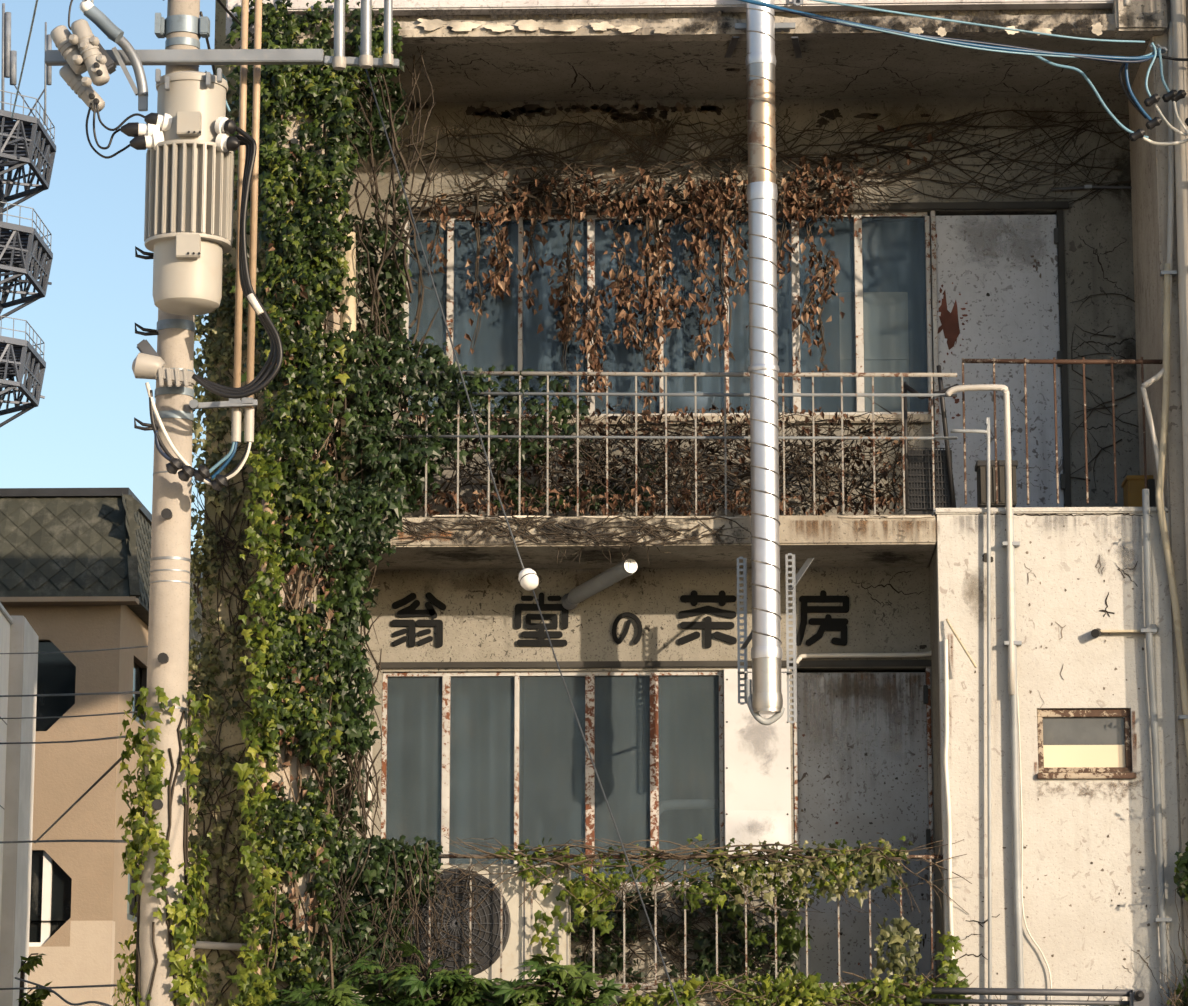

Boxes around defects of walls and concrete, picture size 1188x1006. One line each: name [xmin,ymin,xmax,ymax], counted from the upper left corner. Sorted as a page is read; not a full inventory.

spalling [465,102,723,145]
crack [1079,236,1126,290]
crack [1072,326,1136,359]
crack [850,571,925,606]